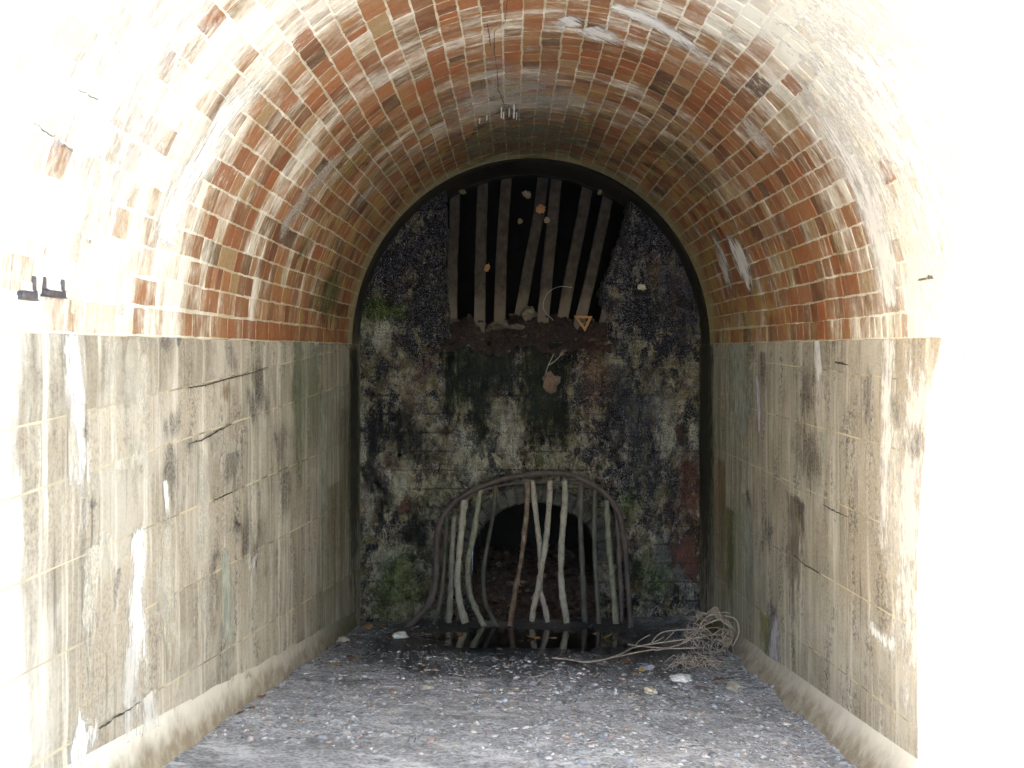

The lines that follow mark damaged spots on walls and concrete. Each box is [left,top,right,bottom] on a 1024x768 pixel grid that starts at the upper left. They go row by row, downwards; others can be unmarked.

crack [481,0,514,142]
leakage [348,70,715,612]
crack [188,369,265,388]
crack [165,424,232,482]
crack [757,464,848,517]
leakage [115,527,158,740]
crack [99,702,140,729]